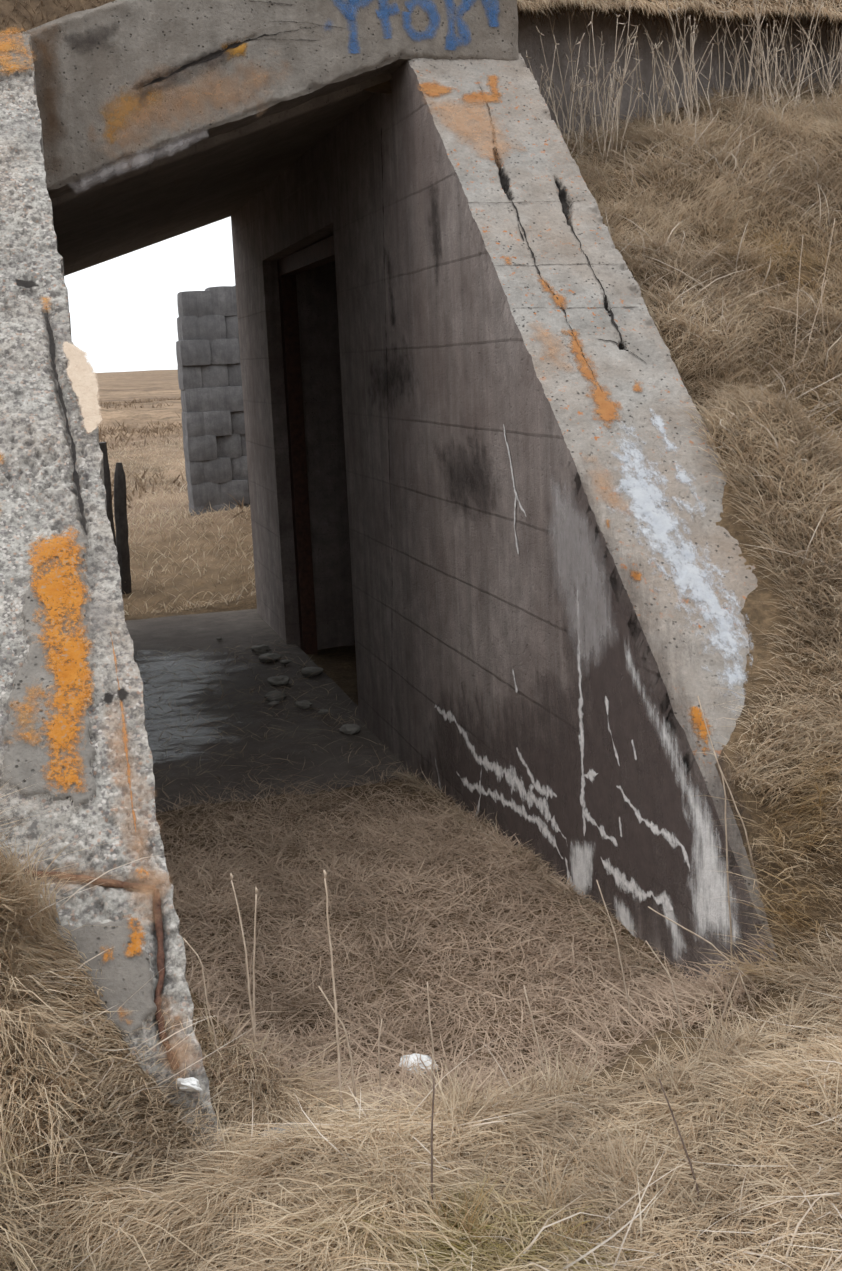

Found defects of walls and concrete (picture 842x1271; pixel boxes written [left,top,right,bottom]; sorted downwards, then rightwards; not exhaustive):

crack [137,1,342,94]
crack [480,87,646,391]
damp [503,424,526,554]
damp [422,489,742,959]